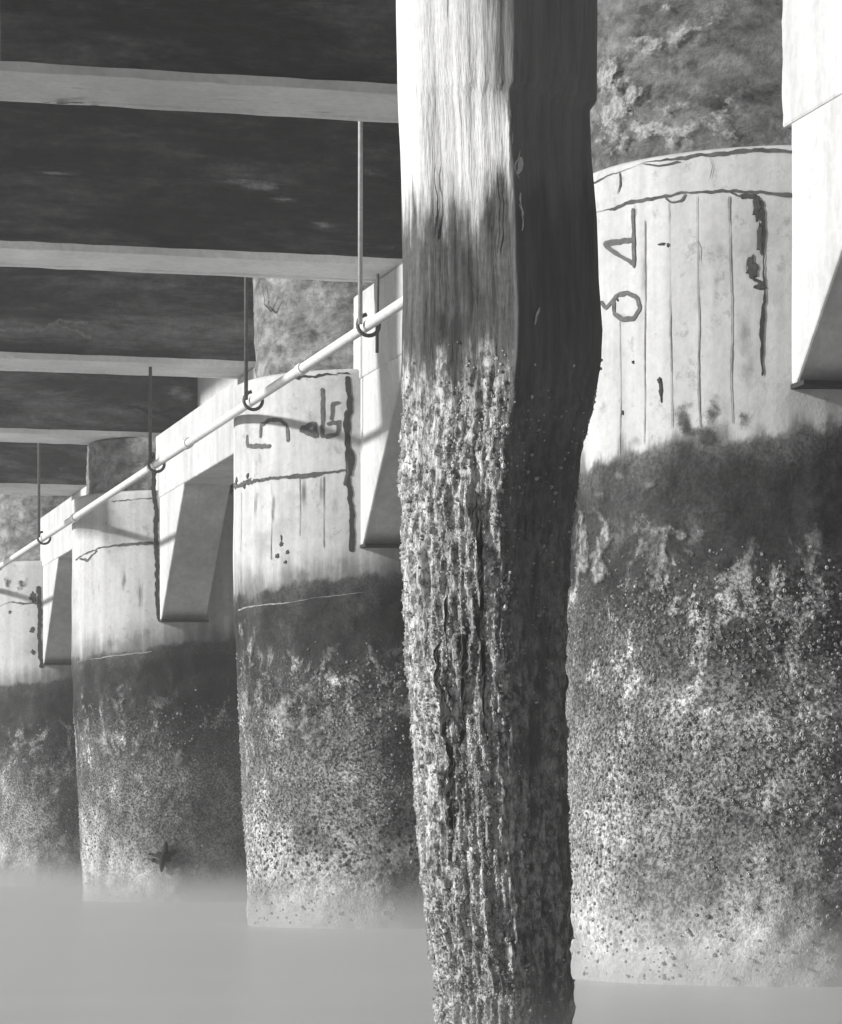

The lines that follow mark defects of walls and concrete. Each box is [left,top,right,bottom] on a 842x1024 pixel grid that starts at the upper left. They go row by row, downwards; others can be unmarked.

crack [594,148,792,455]
crack [76,452,160,621]
crack [233,372,355,559]
leakage [675,400,717,444]
crack [3,586,44,668]